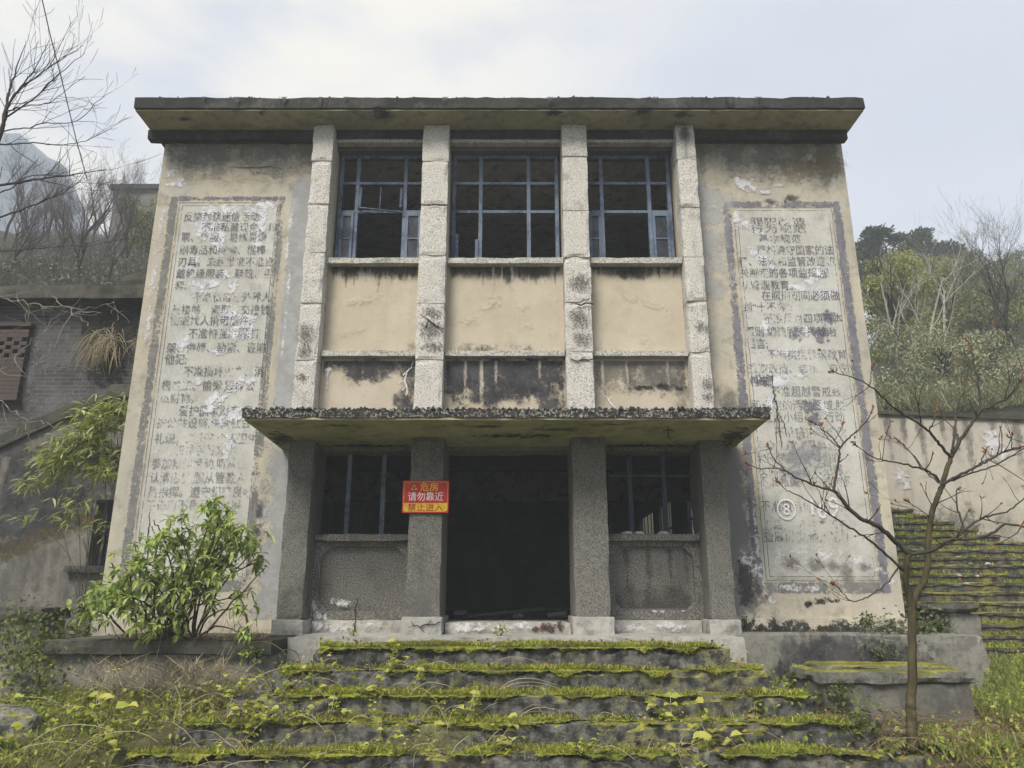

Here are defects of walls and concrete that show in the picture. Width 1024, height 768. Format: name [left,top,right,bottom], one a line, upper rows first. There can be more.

peeling [732,177,782,195]
peeling [194,200,275,251]
water stain [331,267,417,281]
water stain [450,267,560,282]
water stain [592,267,678,279]
water stain [464,361,497,402]
water stain [625,361,685,391]
peeling [203,376,256,461]
water stain [733,495,903,632]